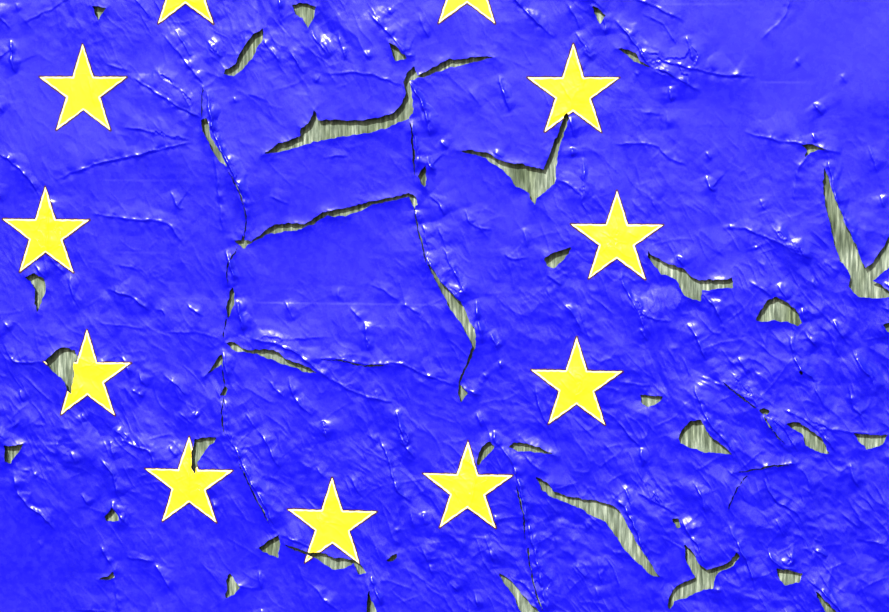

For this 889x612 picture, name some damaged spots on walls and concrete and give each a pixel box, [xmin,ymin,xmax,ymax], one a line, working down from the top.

peeling [220,25,267,79]
peeling [259,38,498,157]
peeling [455,113,572,208]
peeling [231,232,259,253]
peeling [819,164,889,302]
peeling [644,247,737,305]
crack [197,84,479,534]
peeling [754,294,806,329]
peeling [42,344,78,393]
peeling [675,417,735,458]
peeling [532,473,742,612]
peeling [495,570,541,612]